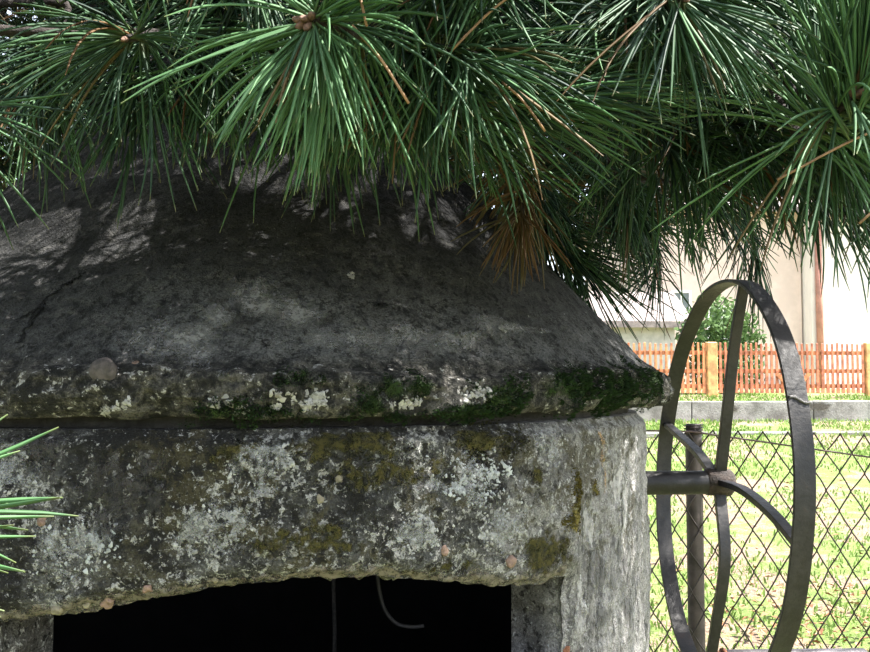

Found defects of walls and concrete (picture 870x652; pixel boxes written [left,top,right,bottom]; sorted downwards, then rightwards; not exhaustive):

crack [16,268,90,343]